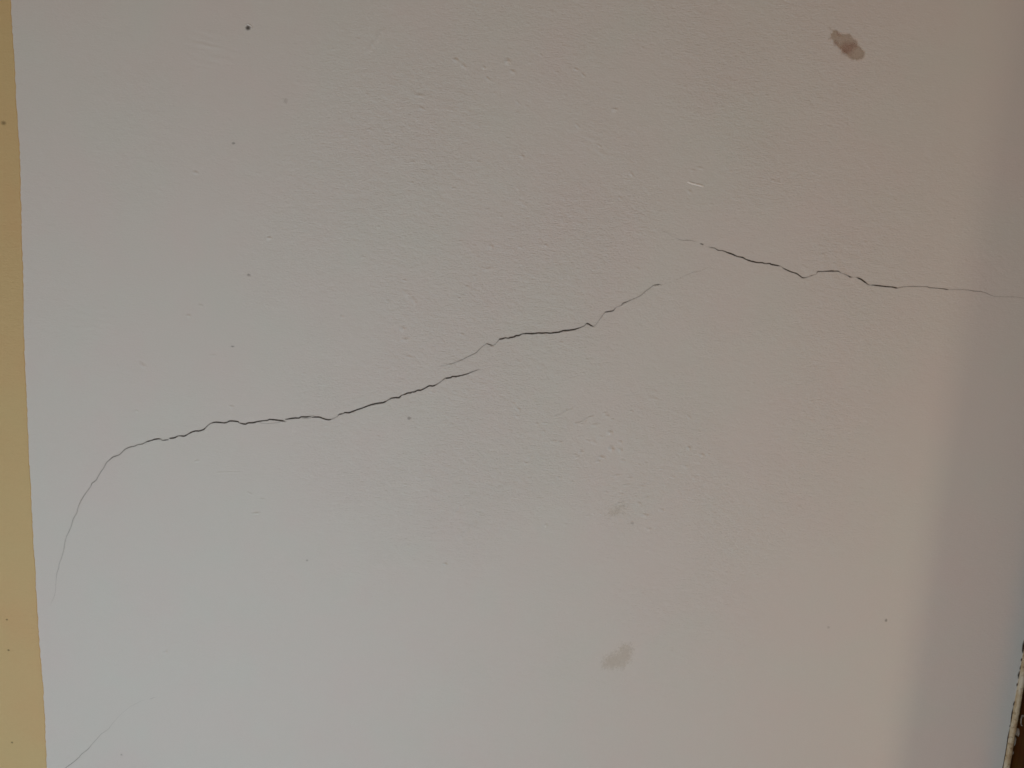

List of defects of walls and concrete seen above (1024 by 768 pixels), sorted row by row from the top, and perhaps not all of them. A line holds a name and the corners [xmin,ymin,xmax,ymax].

crack [702,244,896,288]
crack [488,302,627,348]
crack [112,372,471,458]